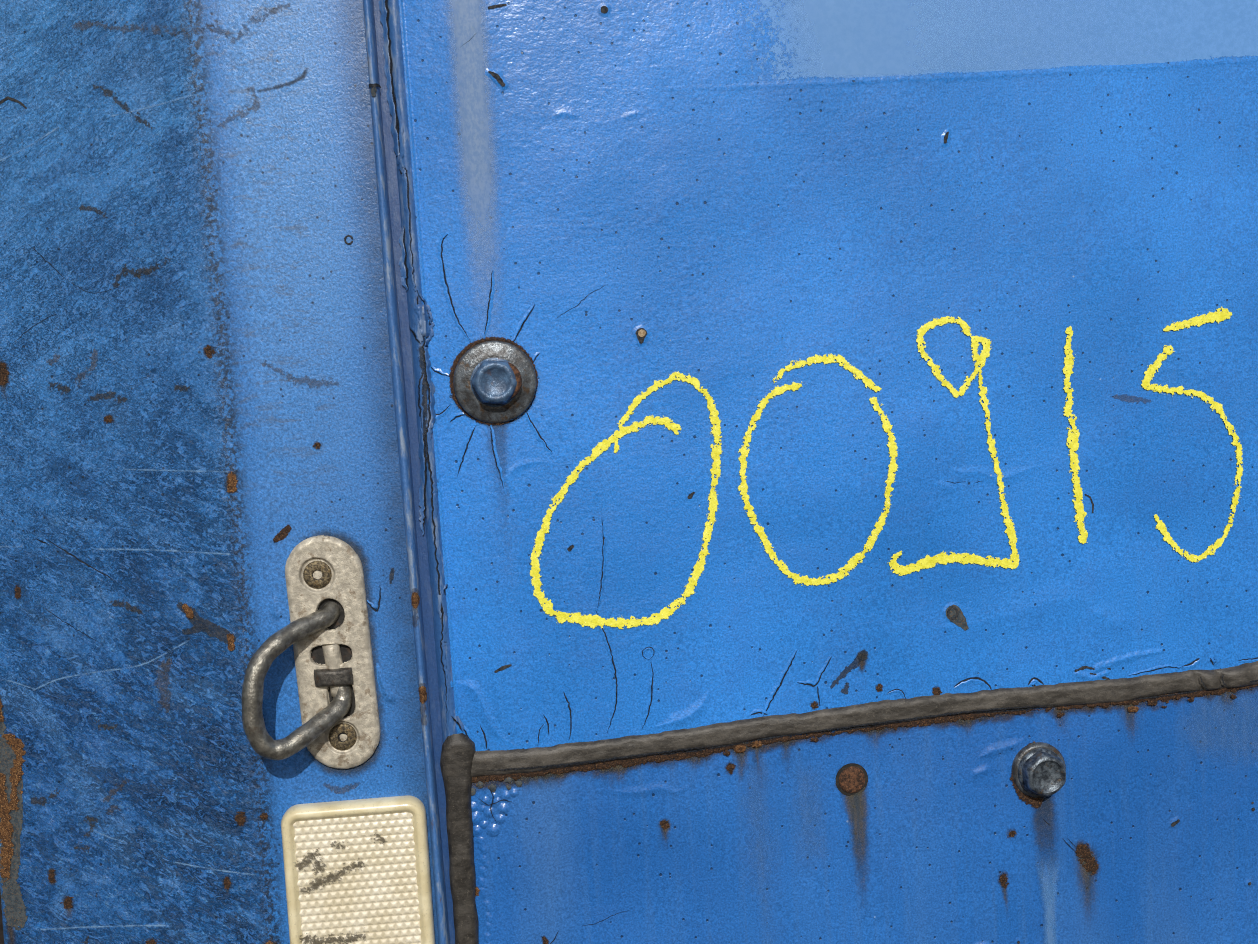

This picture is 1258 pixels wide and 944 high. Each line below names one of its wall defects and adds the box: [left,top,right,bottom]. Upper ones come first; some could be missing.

corrosion [0,362,10,385]
corrosion [472,684,1258,788]
corrosion [846,788,866,859]
corrosion [999,873,1009,899]
corrosion [1063,839,1100,895]